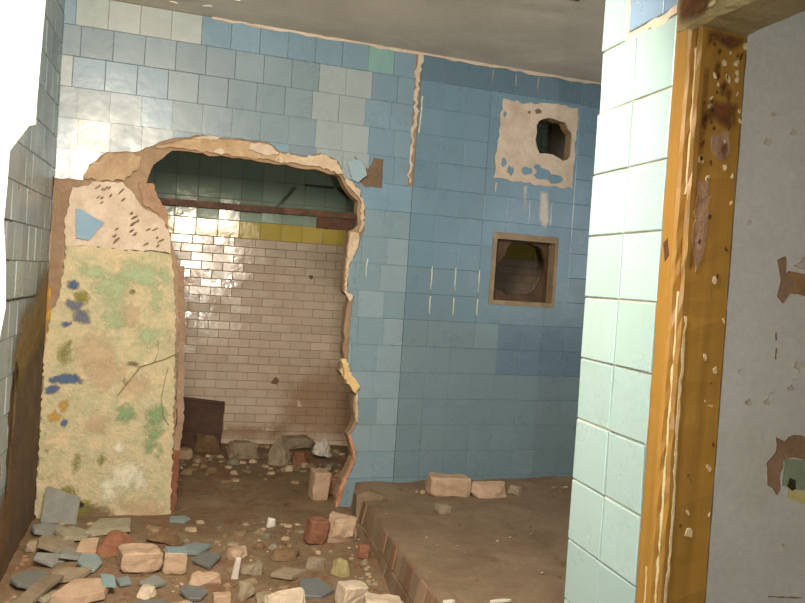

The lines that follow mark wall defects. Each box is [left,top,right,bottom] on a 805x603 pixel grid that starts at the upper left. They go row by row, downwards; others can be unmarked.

spalling [493,98,579,188]
spalling [154,136,383,302]
flaking render [777,257,805,303]
spalling [339,358,360,423]
spalling [335,434,356,507]
spalling [352,486,390,521]
flaking render [766,435,805,504]